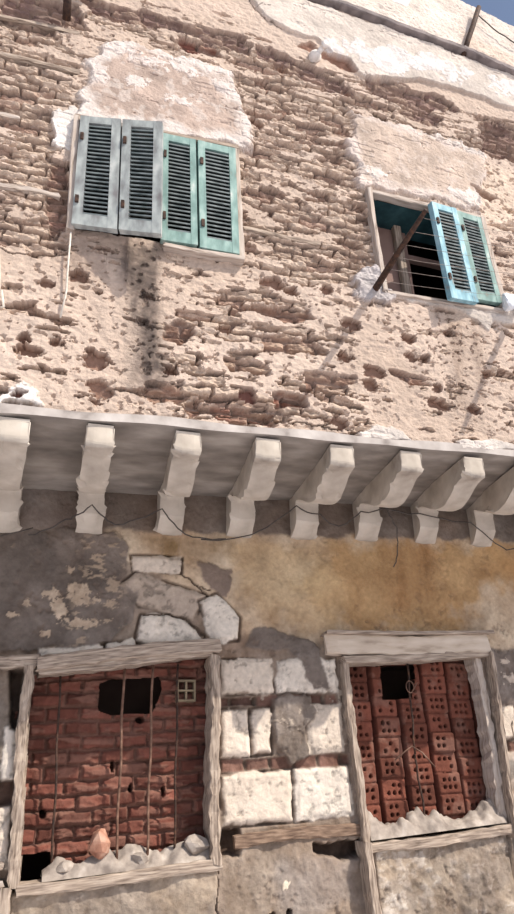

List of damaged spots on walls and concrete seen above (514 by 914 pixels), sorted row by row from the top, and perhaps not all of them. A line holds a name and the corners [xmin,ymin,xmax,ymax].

flaking render [0,0,514,163]
spalling [46,160,69,240]
peeling [447,185,497,211]
flaking render [38,276,56,289]
flaking render [69,268,90,284]
flaking render [14,331,65,358]
flaking render [83,346,116,406]
water stain [125,249,161,380]
spalling [141,275,451,428]
flaking render [323,412,354,431]
flaking render [466,403,483,415]
flaking render [0,526,140,653]